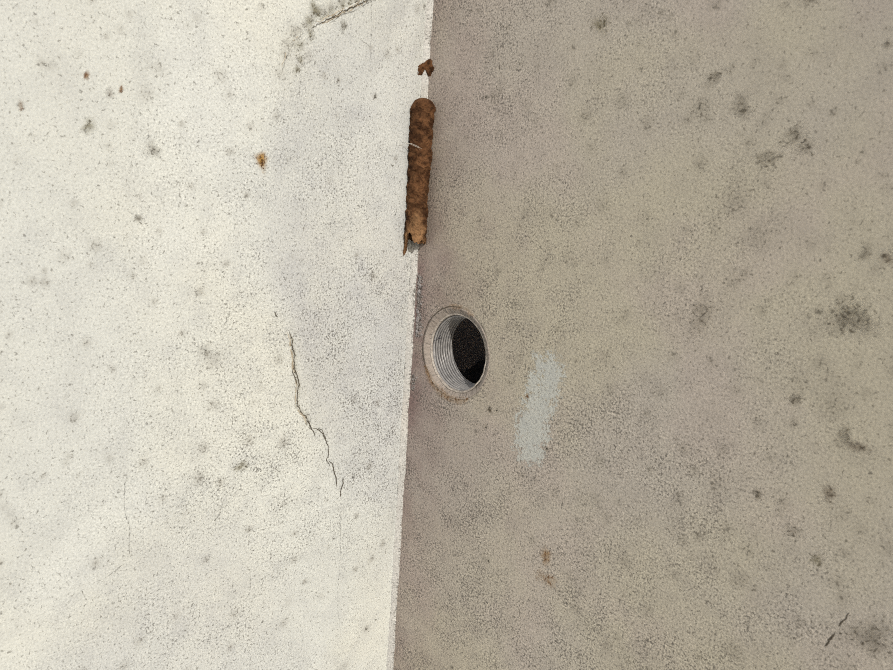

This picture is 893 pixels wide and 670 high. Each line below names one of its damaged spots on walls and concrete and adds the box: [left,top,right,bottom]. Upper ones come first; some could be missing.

crack [282,0,370,73]
crack [275,312,344,496]